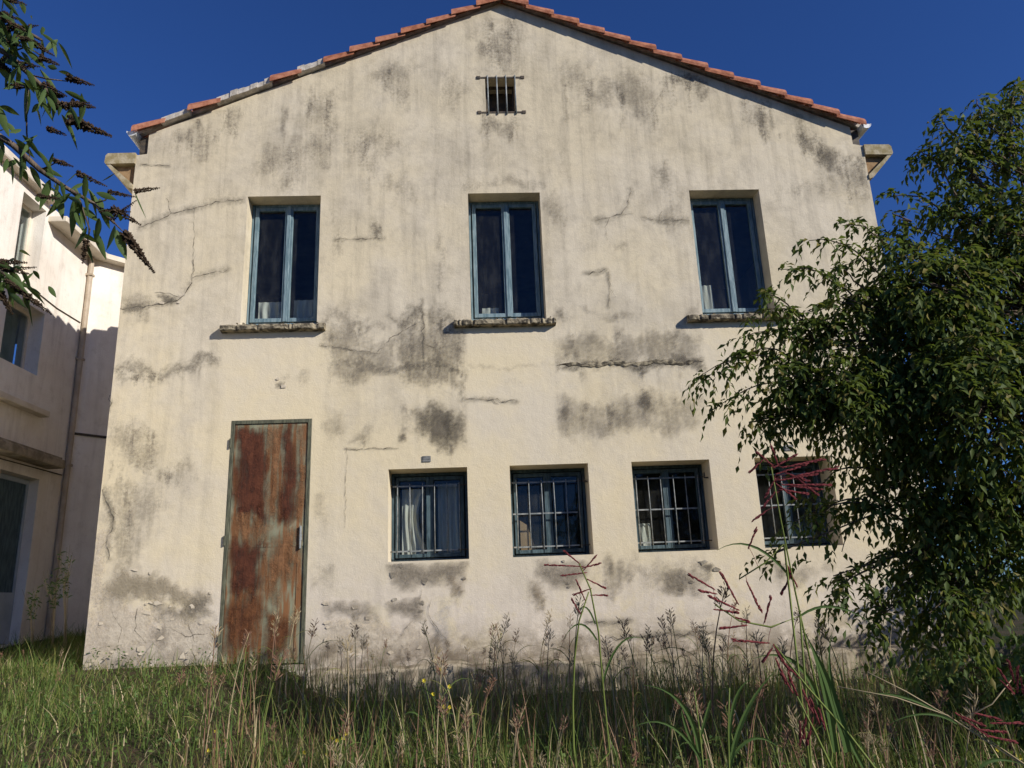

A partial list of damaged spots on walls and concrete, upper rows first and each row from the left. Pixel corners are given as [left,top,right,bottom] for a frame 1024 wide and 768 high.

crack [120,199,237,310]
rust [232,424,304,527]
leakage [420,404,463,446]
rust [224,539,296,655]